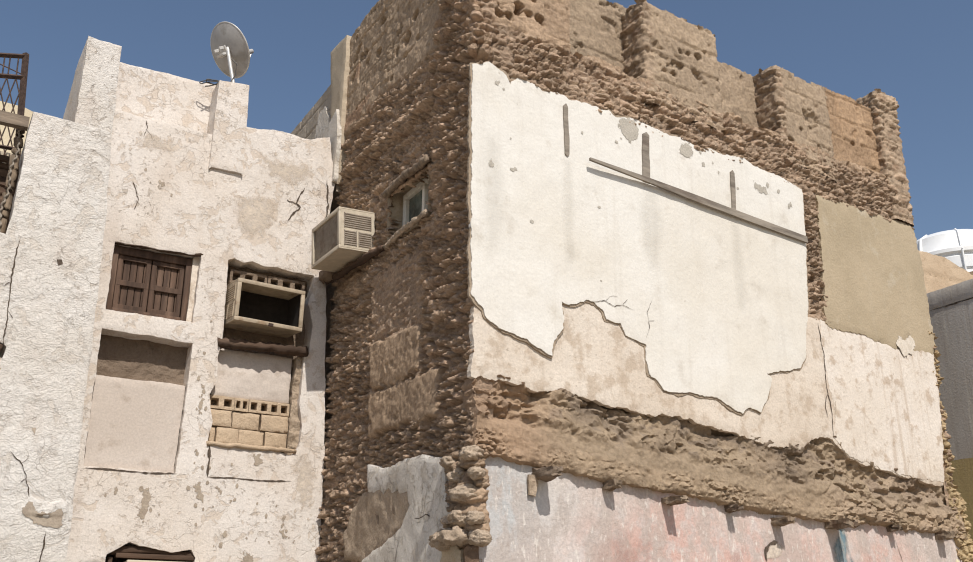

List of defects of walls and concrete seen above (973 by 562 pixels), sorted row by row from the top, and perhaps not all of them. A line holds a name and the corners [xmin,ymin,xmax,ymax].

crack [287,184,329,220]
crack [2,241,20,347]
flaking render [467,62,944,487]
crack [818,325,834,435]
crack [11,452,29,495]
flaking render [362,454,451,562]
peeling [527,474,538,497]